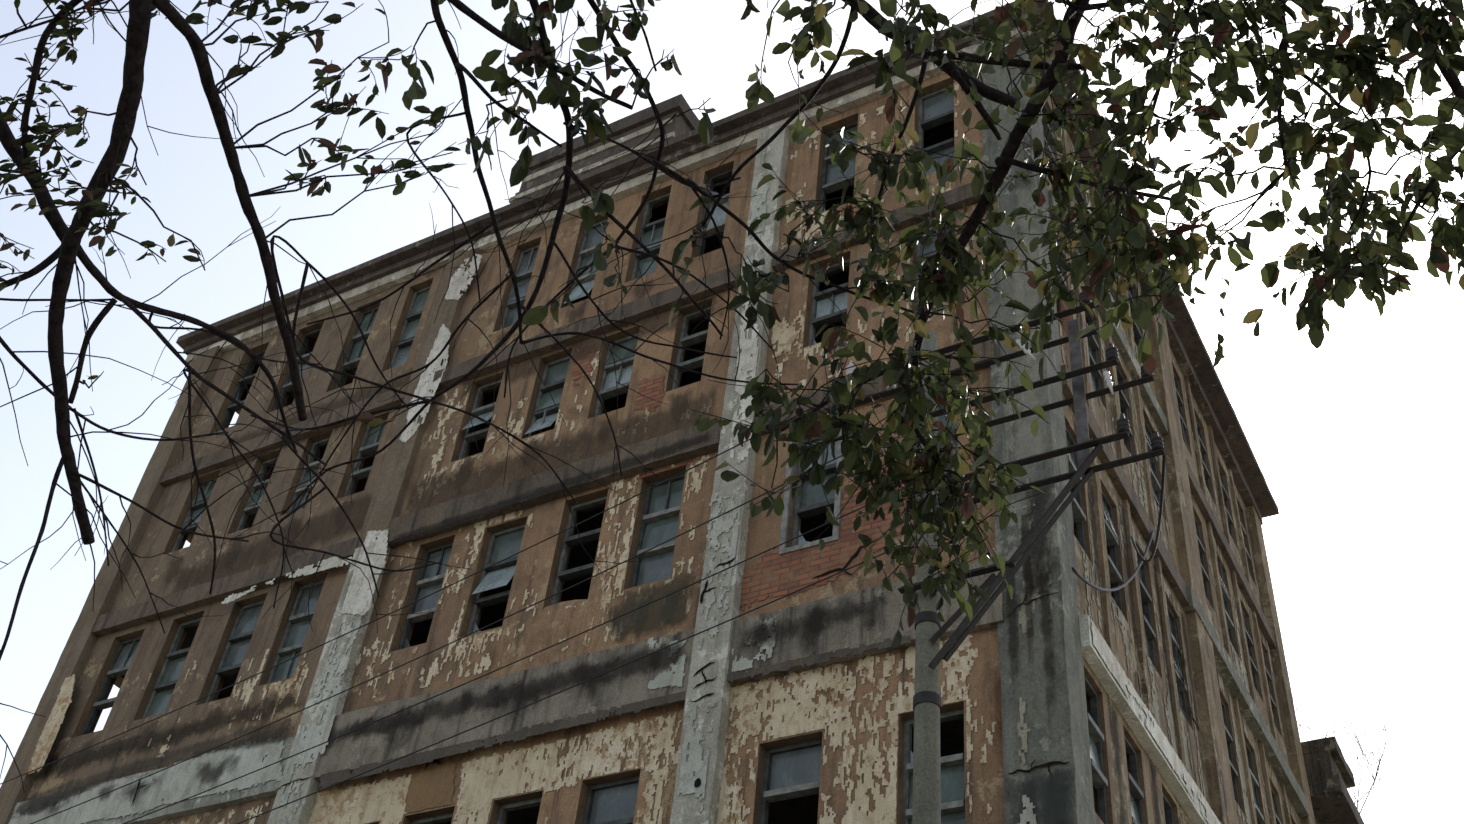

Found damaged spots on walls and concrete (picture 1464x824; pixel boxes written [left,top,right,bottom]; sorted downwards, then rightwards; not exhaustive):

peeling [445,253,482,300]
peeling [729,176,844,463]
peeling [847,258,932,355]
peeling [399,324,599,483]
water stain [16,694,292,815]
peeling [11,455,915,824]
water stain [327,644,681,743]
water stain [610,576,690,639]
water stain [742,603,872,646]
peeling [940,635,997,814]
peeling [1017,795,1037,824]
water stain [1007,488,1054,677]